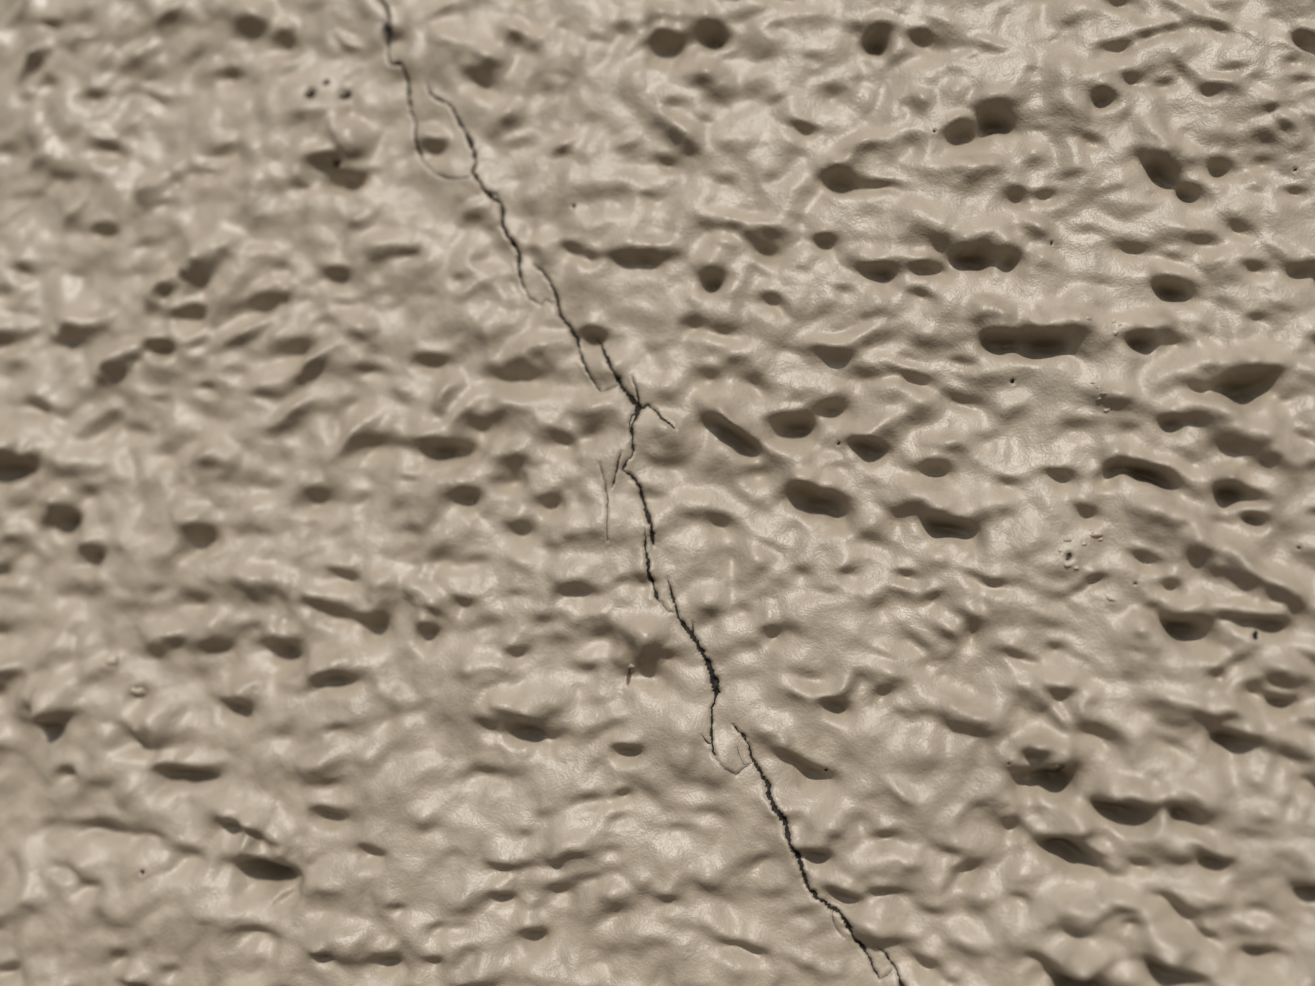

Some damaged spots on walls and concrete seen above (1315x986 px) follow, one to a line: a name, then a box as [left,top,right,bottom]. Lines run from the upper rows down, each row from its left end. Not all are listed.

crack [380,0,905,986]